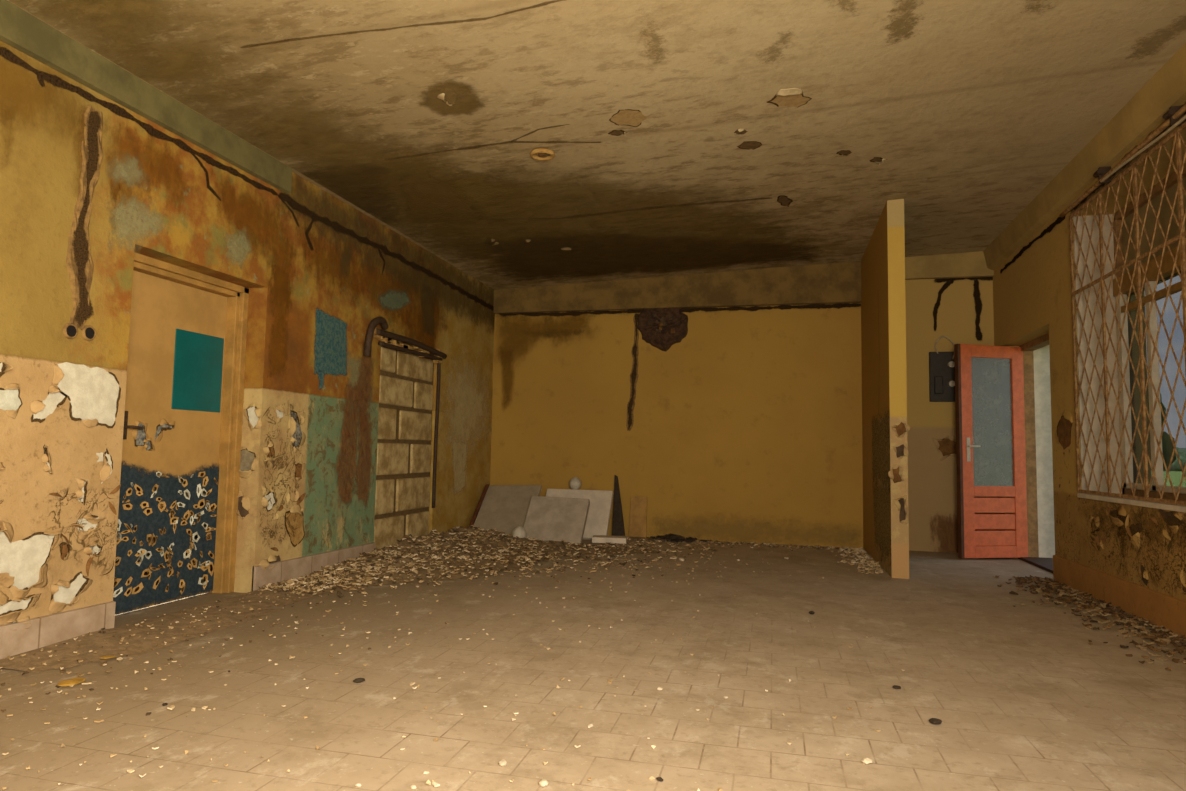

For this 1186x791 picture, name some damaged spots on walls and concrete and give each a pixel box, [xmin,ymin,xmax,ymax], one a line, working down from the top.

crack [241,0,564,48]
damp [886,0,917,42]
crack [0,47,644,316]
damp [42,0,813,407]
crack [491,198,771,221]
spalling [637,308,688,352]
crack [680,303,861,313]
peeling [0,362,121,428]
peeling [131,419,175,451]
peeling [236,400,306,570]
peeling [0,445,219,631]
peeling [1088,505,1186,594]